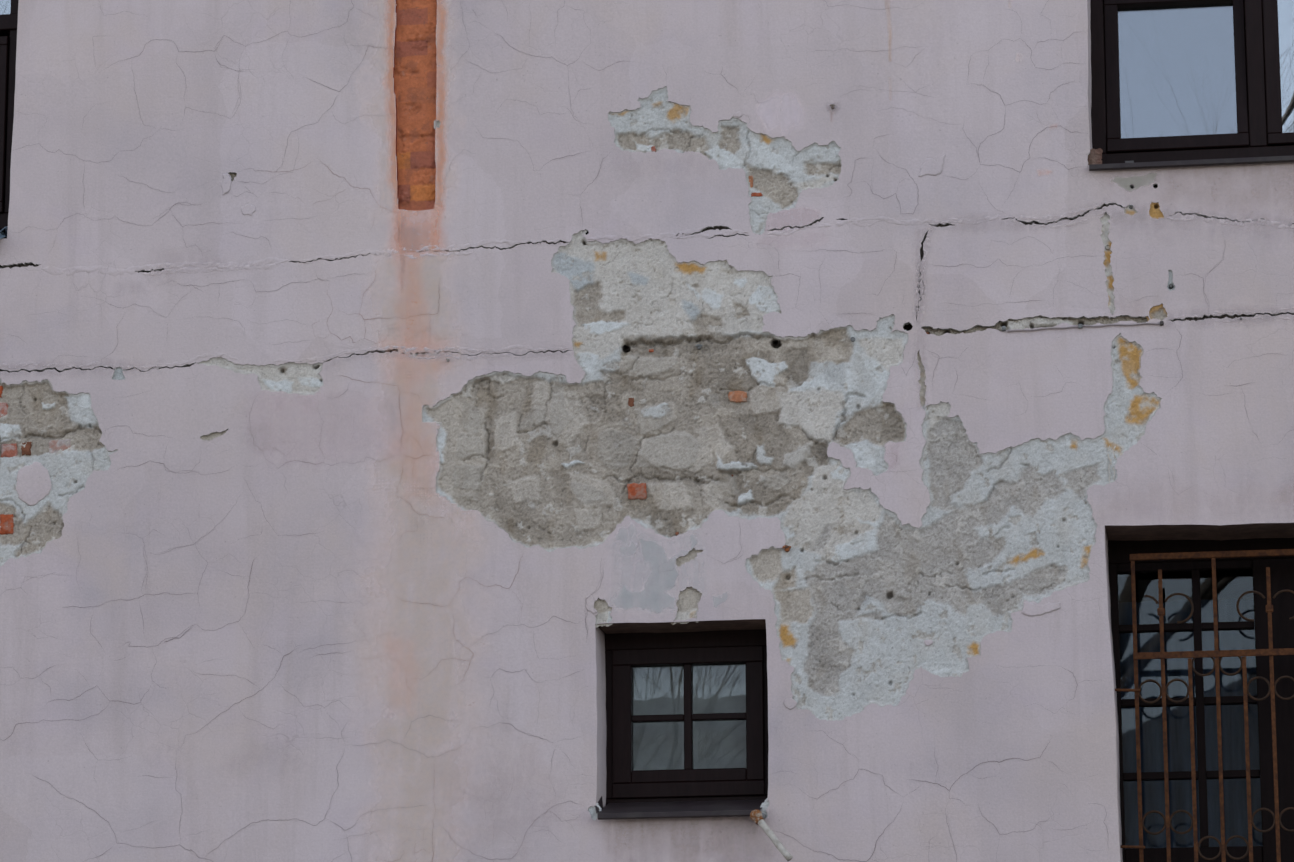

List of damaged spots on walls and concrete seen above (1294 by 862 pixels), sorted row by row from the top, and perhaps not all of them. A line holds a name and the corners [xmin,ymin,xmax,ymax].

flaking render [608,87,842,235]
flaking render [194,357,324,395]
crack [0,1,1148,532]
crack [1147,213,1294,394]
flaking render [0,379,118,567]
flaking render [422,230,1175,721]